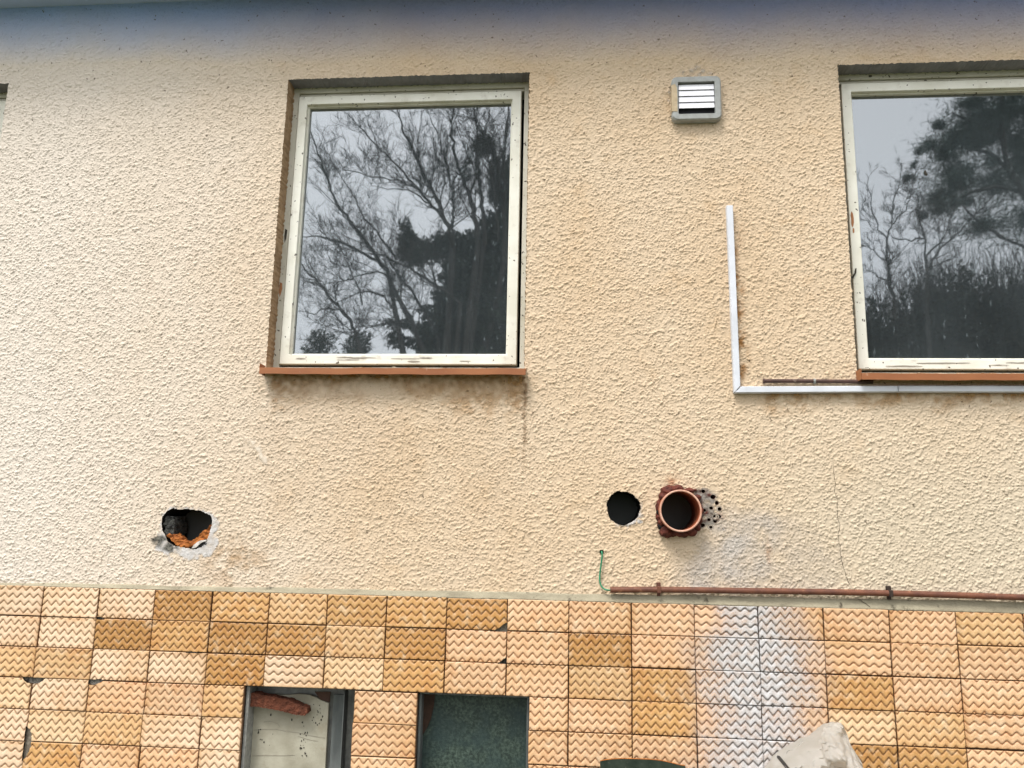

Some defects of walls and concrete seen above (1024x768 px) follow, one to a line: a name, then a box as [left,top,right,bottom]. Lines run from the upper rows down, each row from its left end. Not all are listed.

spalling [152,507,219,560]
leakage [706,606,810,768]